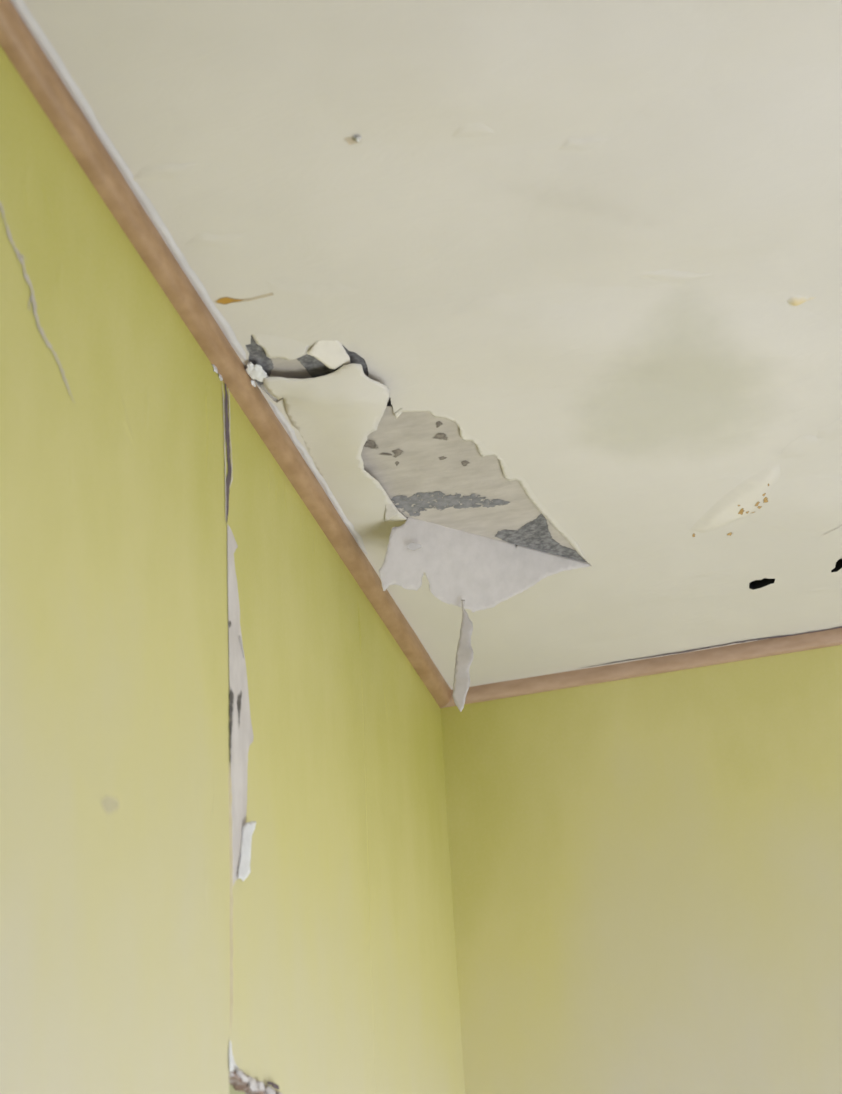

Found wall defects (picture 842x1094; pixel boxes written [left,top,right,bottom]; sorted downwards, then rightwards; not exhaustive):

crack [0,202,75,403]
peeling [246,334,368,401]
peeling [361,406,590,712]
peeling [227,525,283,1094]